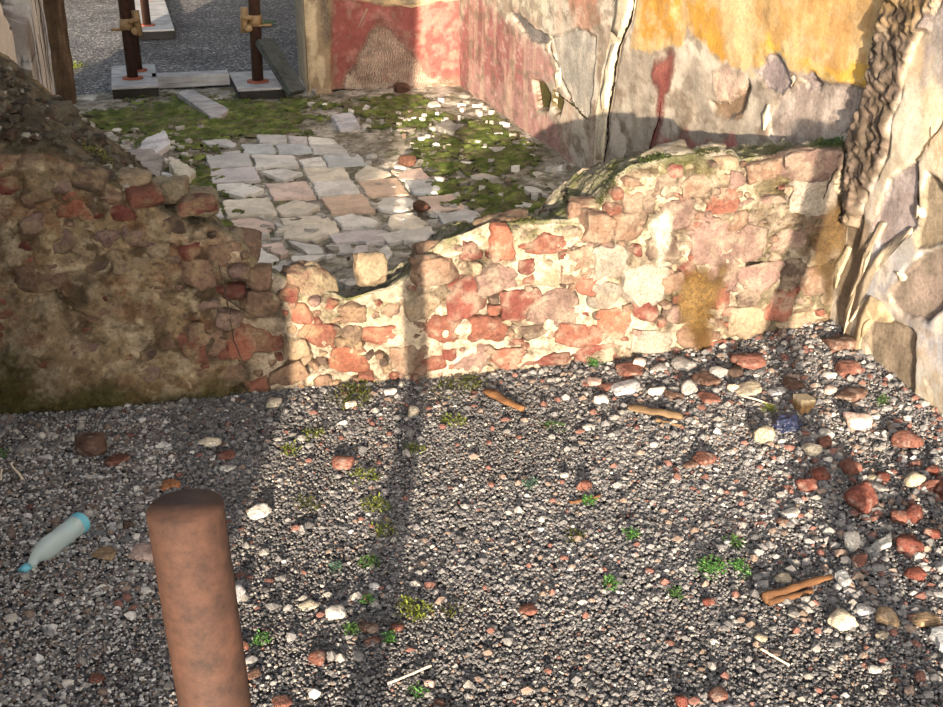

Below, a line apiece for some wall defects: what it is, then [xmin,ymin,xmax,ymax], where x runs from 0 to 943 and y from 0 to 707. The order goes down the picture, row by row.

spalling [512,0,637,165]
crack [550,0,635,161]
crack [649,103,661,150]
peeling [712,65,751,120]
spalling [757,54,863,143]
crack [915,121,943,205]
water stain [679,266,727,353]
peeling [833,164,943,394]